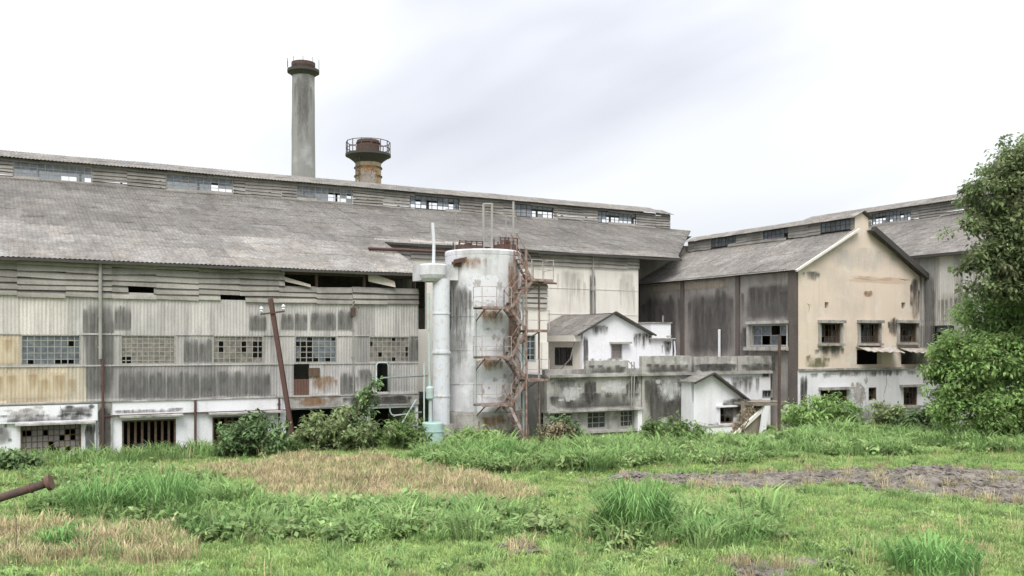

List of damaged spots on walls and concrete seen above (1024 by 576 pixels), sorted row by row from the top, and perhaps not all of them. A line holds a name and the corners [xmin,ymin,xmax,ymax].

leakage [0,306,270,450]
leakage [281,311,353,330]
leakage [450,289,471,327]
rust [483,264,518,347]
leakage [550,277,788,425]
leakage [800,346,913,406]
leakage [910,279,960,349]